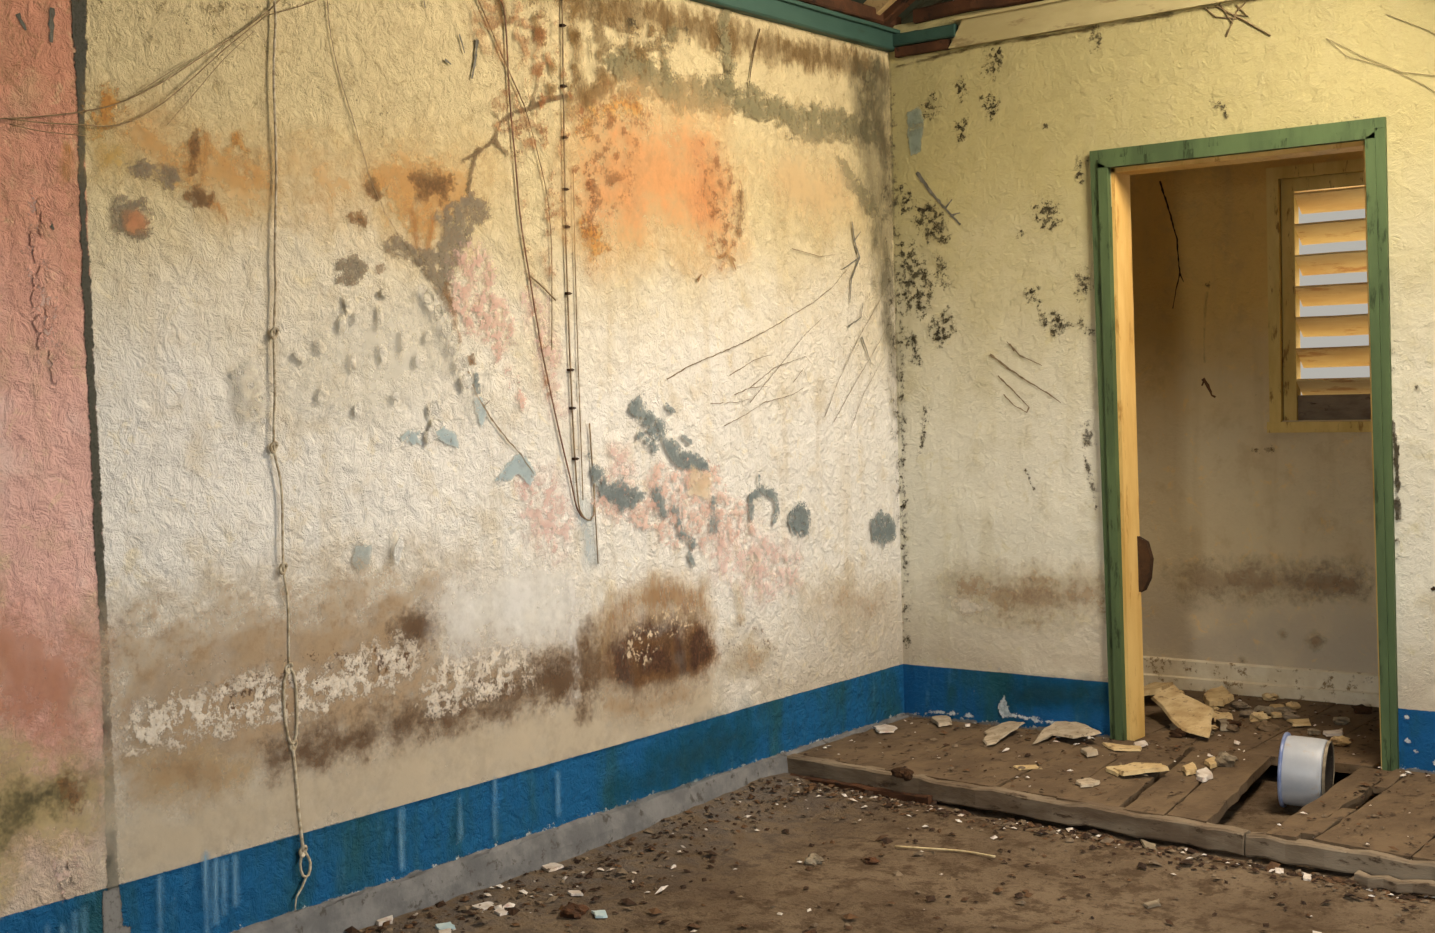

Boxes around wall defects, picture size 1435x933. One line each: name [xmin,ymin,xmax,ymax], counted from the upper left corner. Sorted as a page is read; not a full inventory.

water stain [954,47,1003,142]
peeling [110,194,154,243]
water stain [1017,200,1063,239]
peeling [335,191,526,427]
water stain [471,0,957,649]
water stain [1025,286,1095,337]
peeling [48,0,131,933]
peeling [401,399,459,449]
peeling [588,394,811,593]
peeling [871,509,896,547]
water stain [951,571,1105,616]
water stain [0,557,716,899]